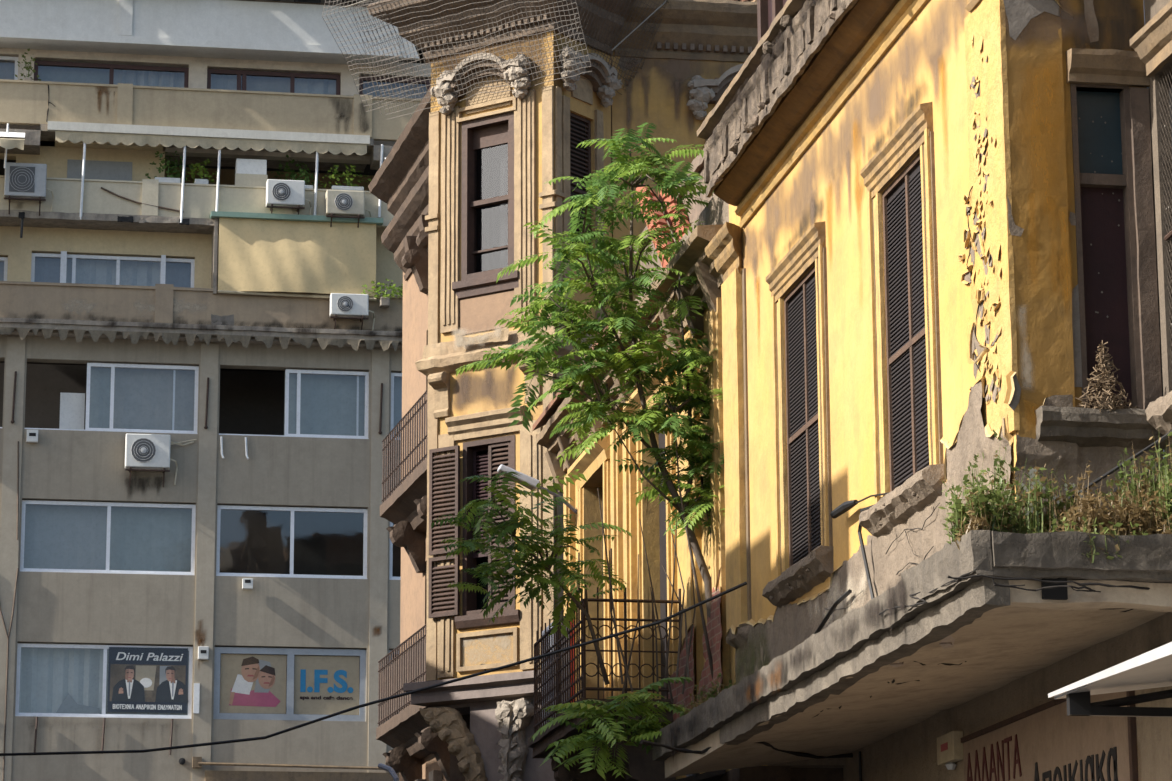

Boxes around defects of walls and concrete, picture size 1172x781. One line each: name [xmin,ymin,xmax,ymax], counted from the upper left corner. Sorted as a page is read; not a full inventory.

water stain [560,45,744,127]
water stain [746,0,966,270]
flaking render [1003,0,1099,42]
flaking render [665,75,1165,721]